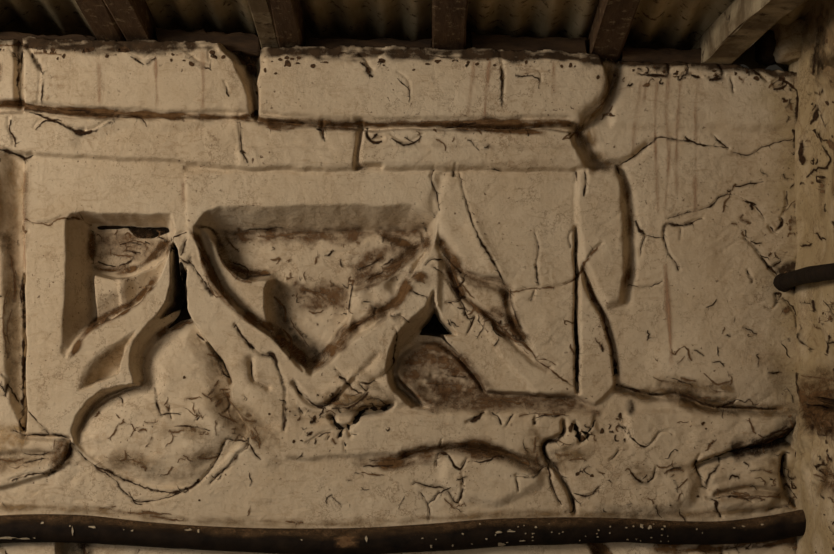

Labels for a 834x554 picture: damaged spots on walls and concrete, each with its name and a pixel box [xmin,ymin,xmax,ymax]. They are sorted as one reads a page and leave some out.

crack [0,43,147,136]
crack [360,60,384,77]
crack [0,120,33,161]
crack [366,128,529,151]
crack [22,215,213,295]
crack [270,239,410,367]
crack [0,278,261,505]
crack [234,324,390,460]
crack [398,443,504,515]